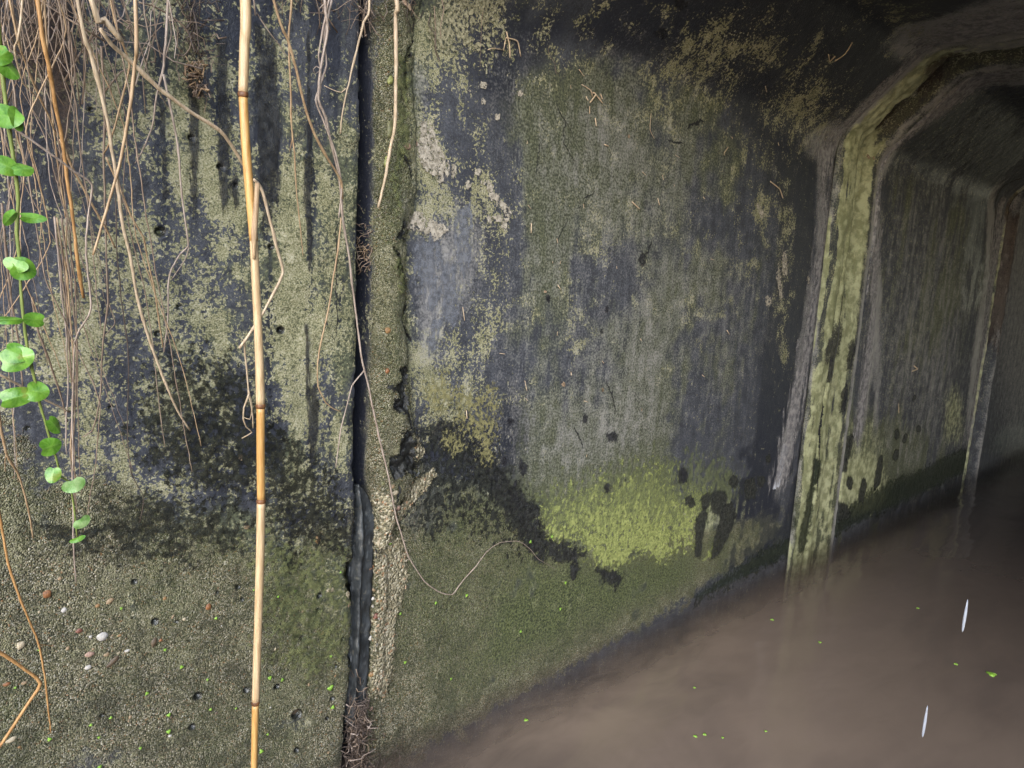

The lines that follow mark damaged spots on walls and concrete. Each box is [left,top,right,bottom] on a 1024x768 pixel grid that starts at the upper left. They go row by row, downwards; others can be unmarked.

water stain [159,101,169,206]
water stain [187,73,199,220]
water stain [215,36,239,212]
water stain [254,23,282,231]
water stain [302,30,313,272]
water stain [685,1,1024,559]
water stain [18,324,355,577]
water stain [399,405,587,581]
water stain [595,567,623,592]
water stain [678,467,688,484]
water stain [694,453,822,607]